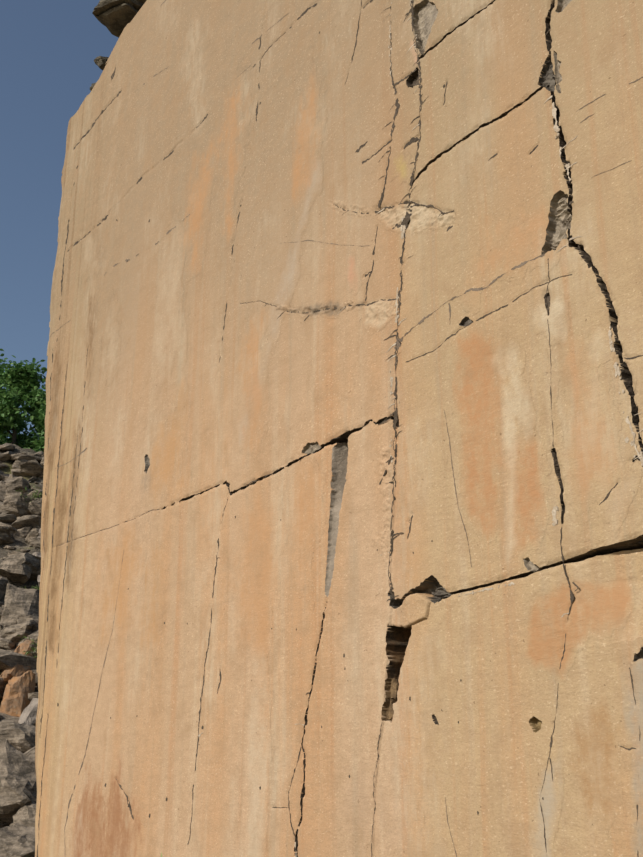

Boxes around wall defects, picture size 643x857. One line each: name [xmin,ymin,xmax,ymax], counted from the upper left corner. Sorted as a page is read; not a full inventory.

spalling [411,0,438,55]
spalling [555,0,572,13]
spalling [327,198,372,219]
spalling [541,190,572,255]
crack [43,0,643,670]
spalling [388,575,453,609]
crack [37,641,59,857]
crack [188,538,221,843]
crack [272,607,326,857]
crack [371,724,382,857]
spalling [381,625,412,723]
crack [539,691,558,853]